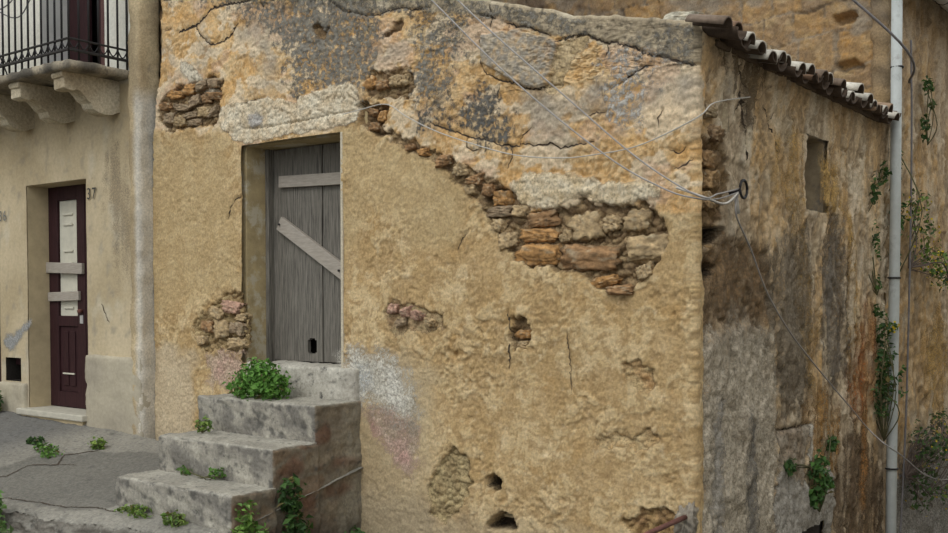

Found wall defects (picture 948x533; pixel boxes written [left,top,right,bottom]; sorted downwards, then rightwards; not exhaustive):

crack [165,0,274,45]
crack [332,2,430,17]
spalling [158,74,224,133]
leakage [198,0,592,151]
spalling [361,66,669,296]
spalling [193,291,253,353]
spalling [384,299,446,337]
leakage [702,125,859,533]
spalling [491,512,517,528]